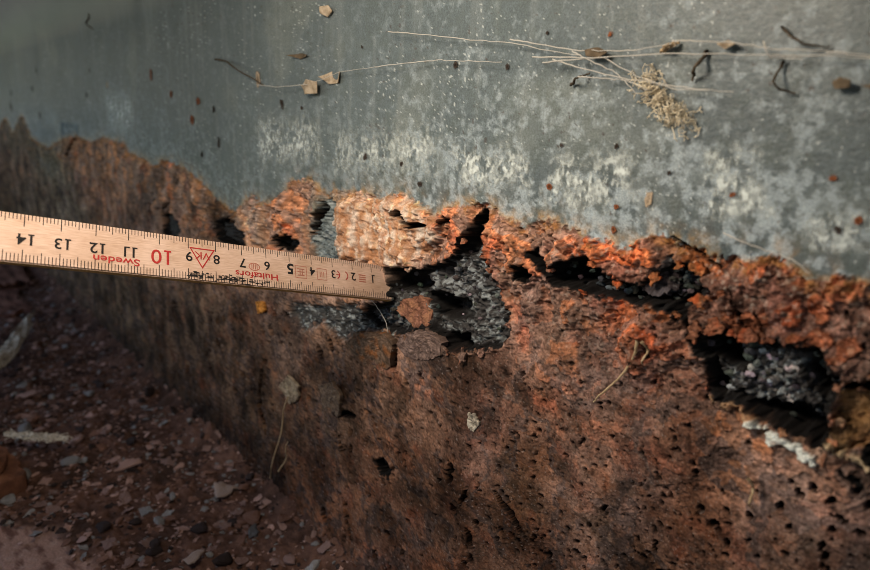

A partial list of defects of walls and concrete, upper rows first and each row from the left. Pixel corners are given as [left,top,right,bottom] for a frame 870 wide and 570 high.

spalling [311,197,338,258]
corrosion [486,203,661,260]
peeling [648,254,708,287]
corrosion [719,253,870,298]
spalling [289,300,396,342]
corrosion [346,295,449,373]
corrosion [279,375,301,404]
corrosion [467,412,481,432]
spalling [777,384,870,467]
corrosion [113,458,142,472]
corrosion [214,481,238,498]
corrosion [183,550,205,565]